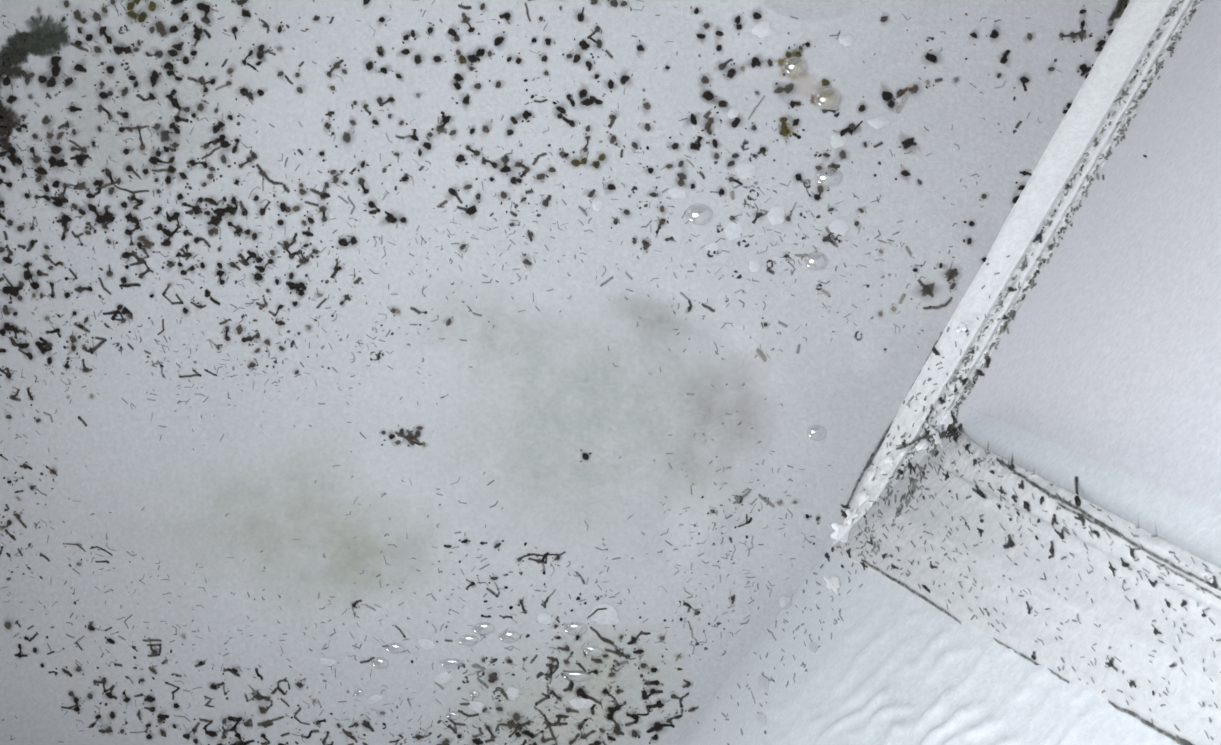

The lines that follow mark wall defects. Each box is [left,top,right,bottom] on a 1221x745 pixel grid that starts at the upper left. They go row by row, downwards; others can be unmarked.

damp [0,0,958,422]
damp [0,454,65,588]
damp [360,425,425,447]
damp [658,488,797,564]
damp [768,0,1221,740]
damp [5,532,749,745]